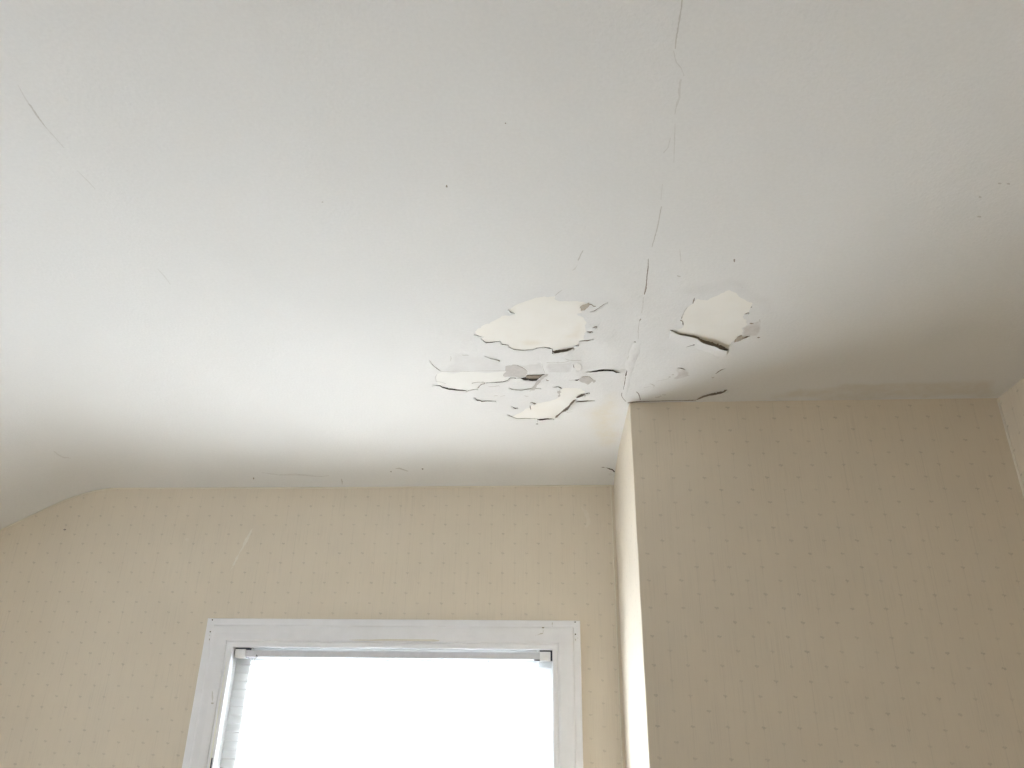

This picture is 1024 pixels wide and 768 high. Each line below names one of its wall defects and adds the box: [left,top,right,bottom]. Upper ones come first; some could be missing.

peeling [429,290,608,422]
crack [586,184,728,403]
peeling [669,290,761,357]